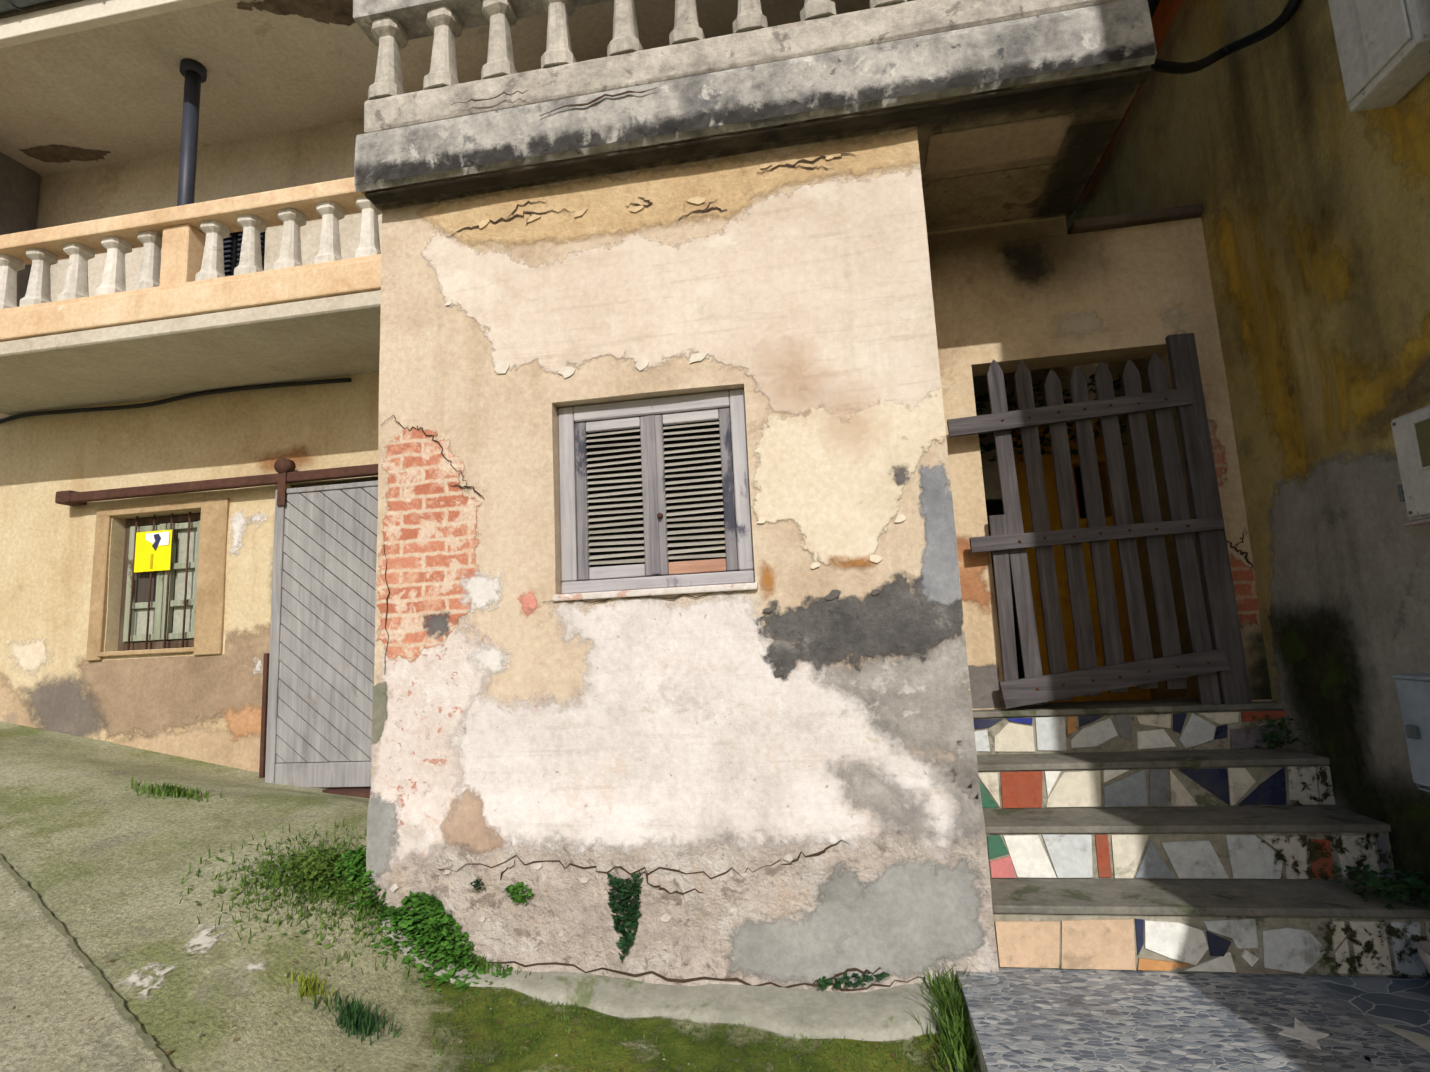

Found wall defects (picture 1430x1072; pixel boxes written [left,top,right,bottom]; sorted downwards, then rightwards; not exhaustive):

flaking render [418,127,946,569]
peeling [367,427,999,993]